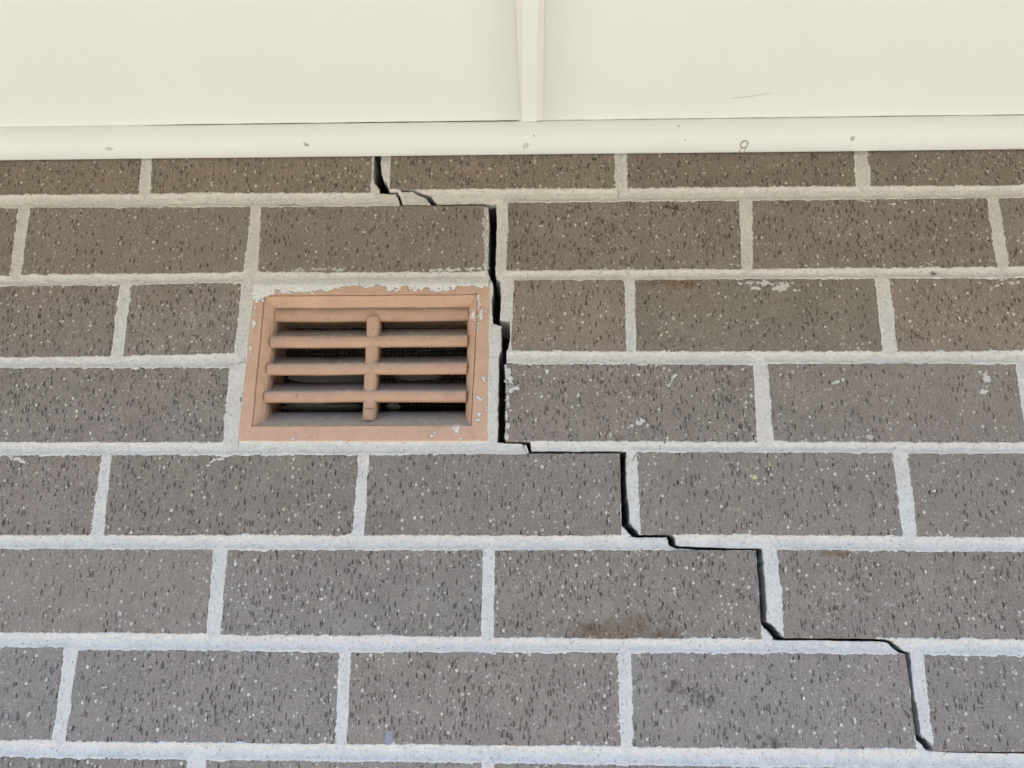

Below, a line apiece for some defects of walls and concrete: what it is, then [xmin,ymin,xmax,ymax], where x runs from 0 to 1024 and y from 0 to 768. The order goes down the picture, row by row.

crack [373,157,1024,754]